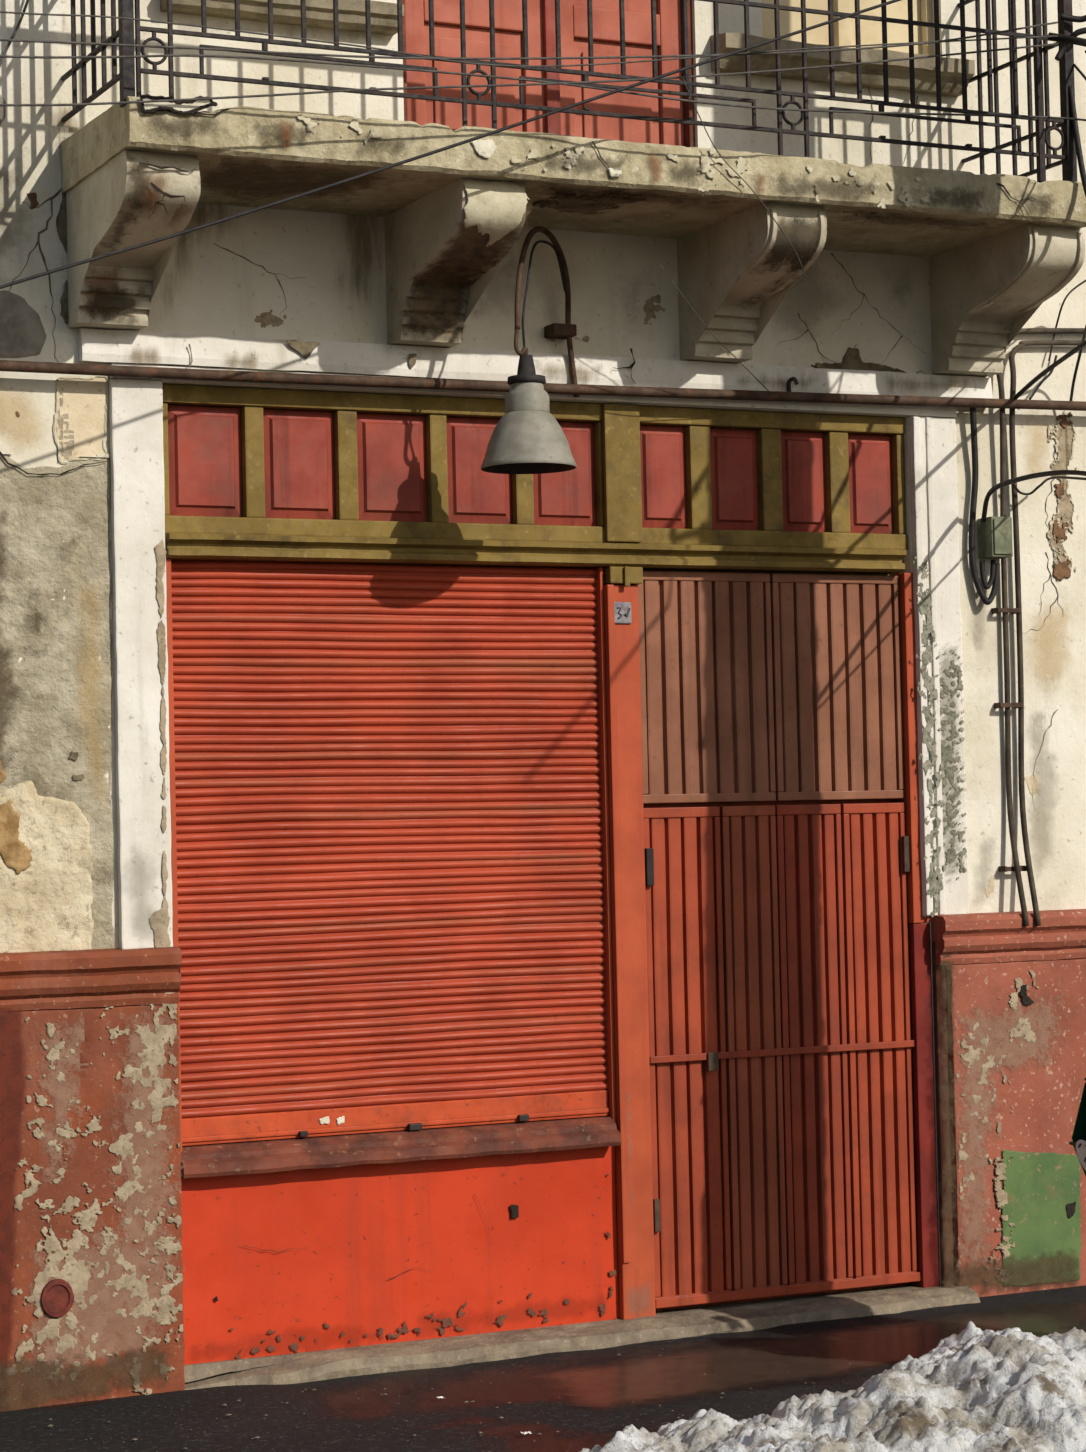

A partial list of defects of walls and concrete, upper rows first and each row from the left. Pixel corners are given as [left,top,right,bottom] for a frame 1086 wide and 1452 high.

leakage [90,288,145,322]
leakage [102,158,149,248]
leakage [202,163,387,200]
leakage [403,206,529,341]
leakage [751,218,821,304]
crack [777,253,930,374]
spalling [1047,410,1079,578]
leakage [0,649,17,767]
spalling [0,376,115,949]
leakage [930,649,968,879]
peeling [7,992,183,1395]
peeling [955,970,1060,1286]